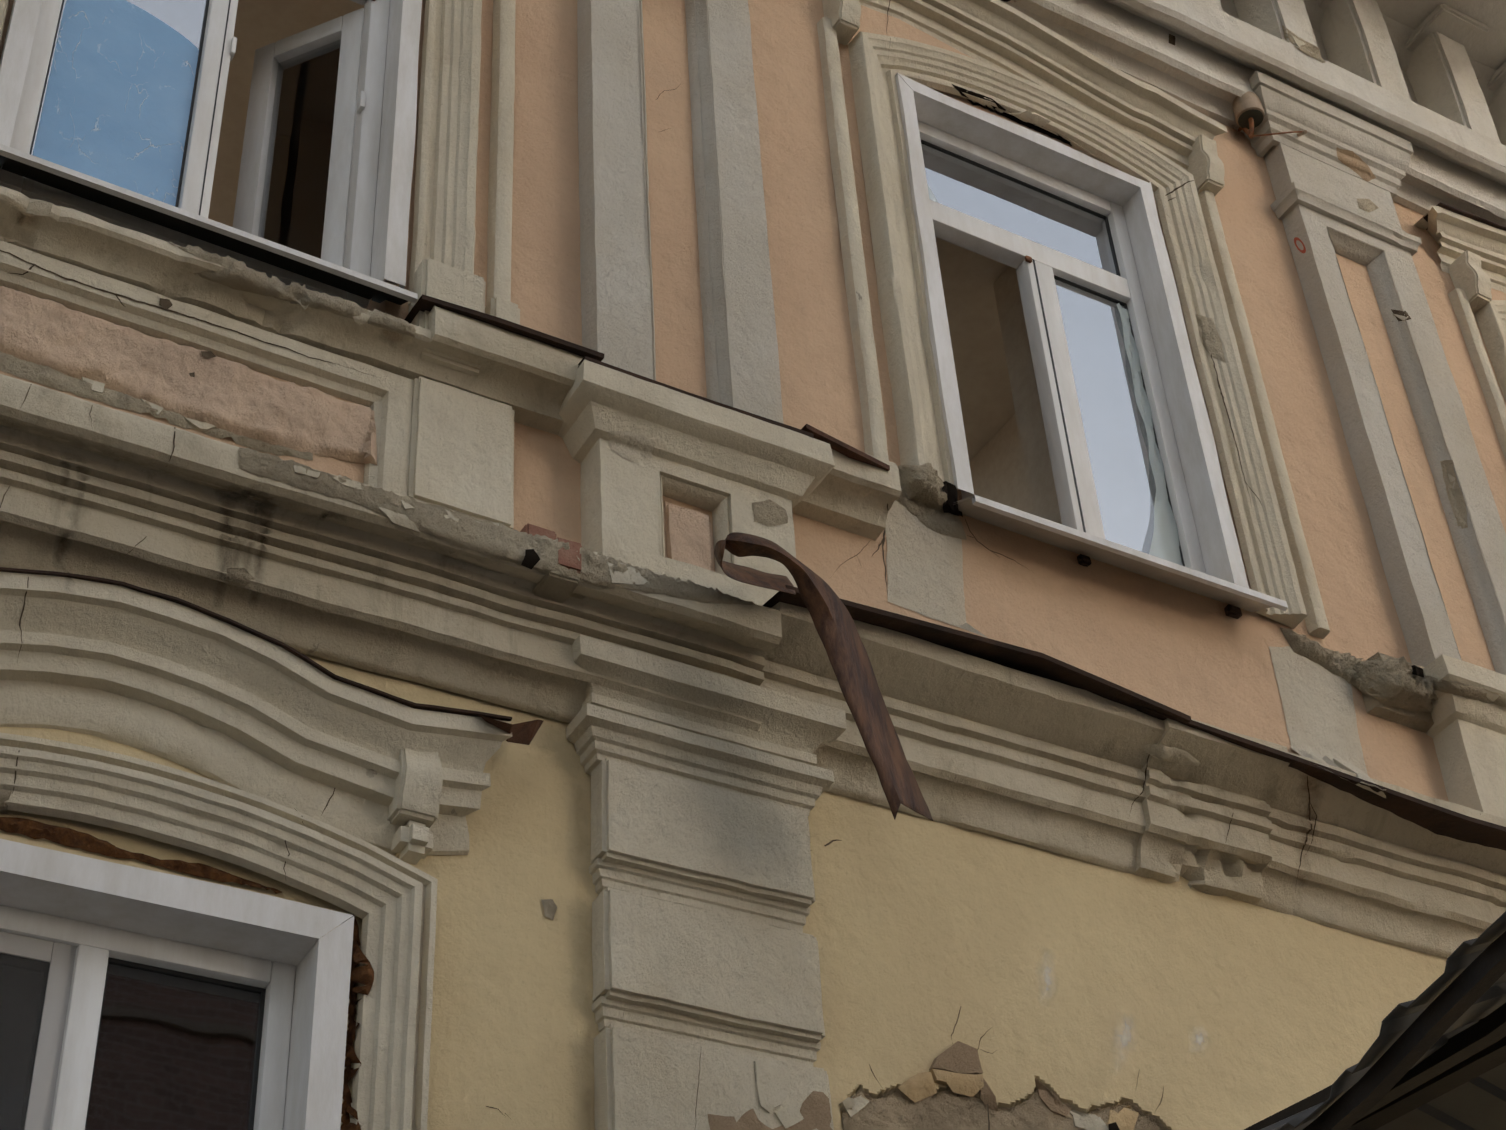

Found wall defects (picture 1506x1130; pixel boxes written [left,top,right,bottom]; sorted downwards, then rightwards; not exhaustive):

spalling [159,298,173,310]
flaking render [169,241,416,338]
flaking render [0,352,363,490]
peeling [378,500,420,532]
crack [829,504,888,596]
crack [1296,776,1317,881]
flaking render [708,1041,1170,1130]